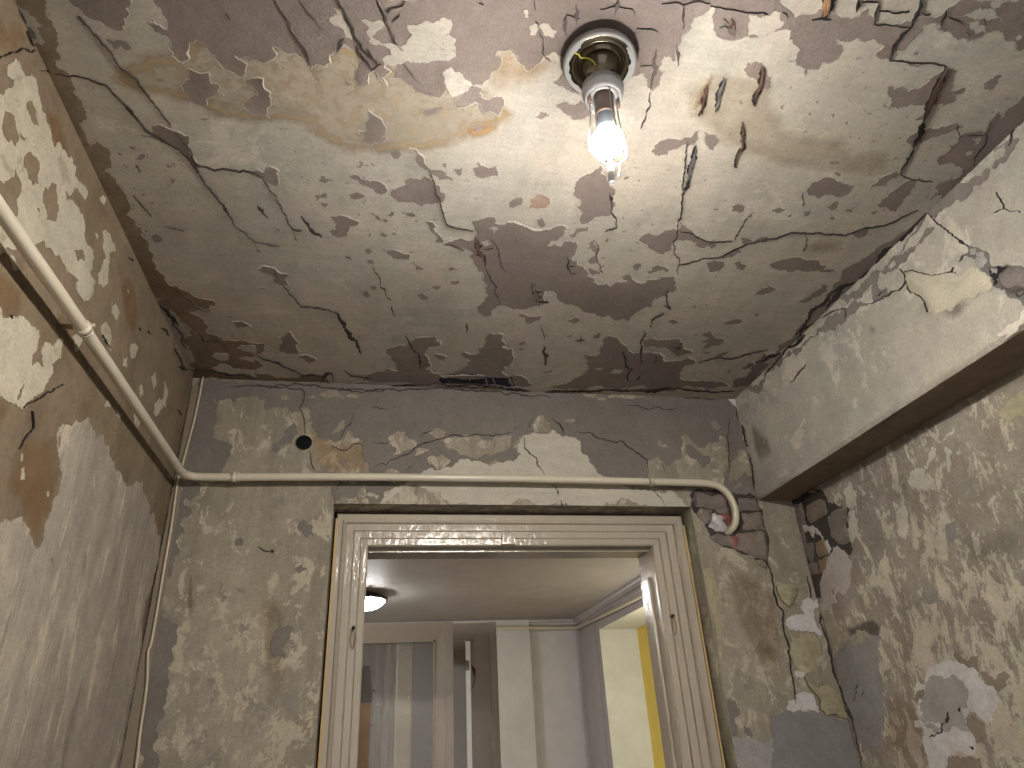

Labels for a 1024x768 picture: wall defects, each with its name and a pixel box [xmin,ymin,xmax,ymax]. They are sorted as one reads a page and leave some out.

crack [0,10,335,313]
water stain [206,68,511,152]
crack [994,192,1021,213]
peeling [0,0,1024,581]
crack [18,384,64,449]
crack [121,143,969,768]
flaking render [793,482,866,598]
peeling [697,541,740,737]
peeling [953,652,1011,692]